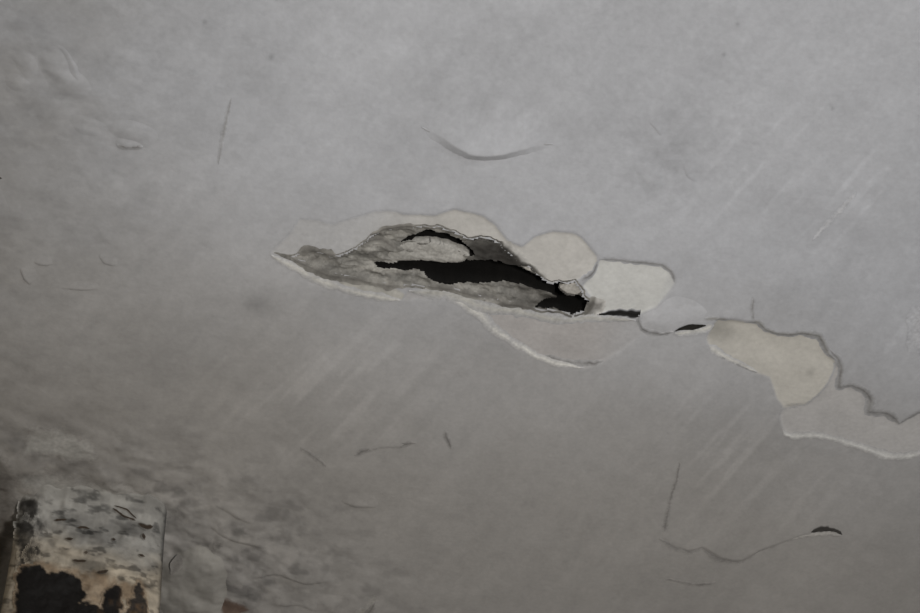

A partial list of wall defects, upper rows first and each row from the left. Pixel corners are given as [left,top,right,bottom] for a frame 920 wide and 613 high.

spalling [269,209,707,370]
peeling [705,318,920,461]
water stain [0,450,146,577]